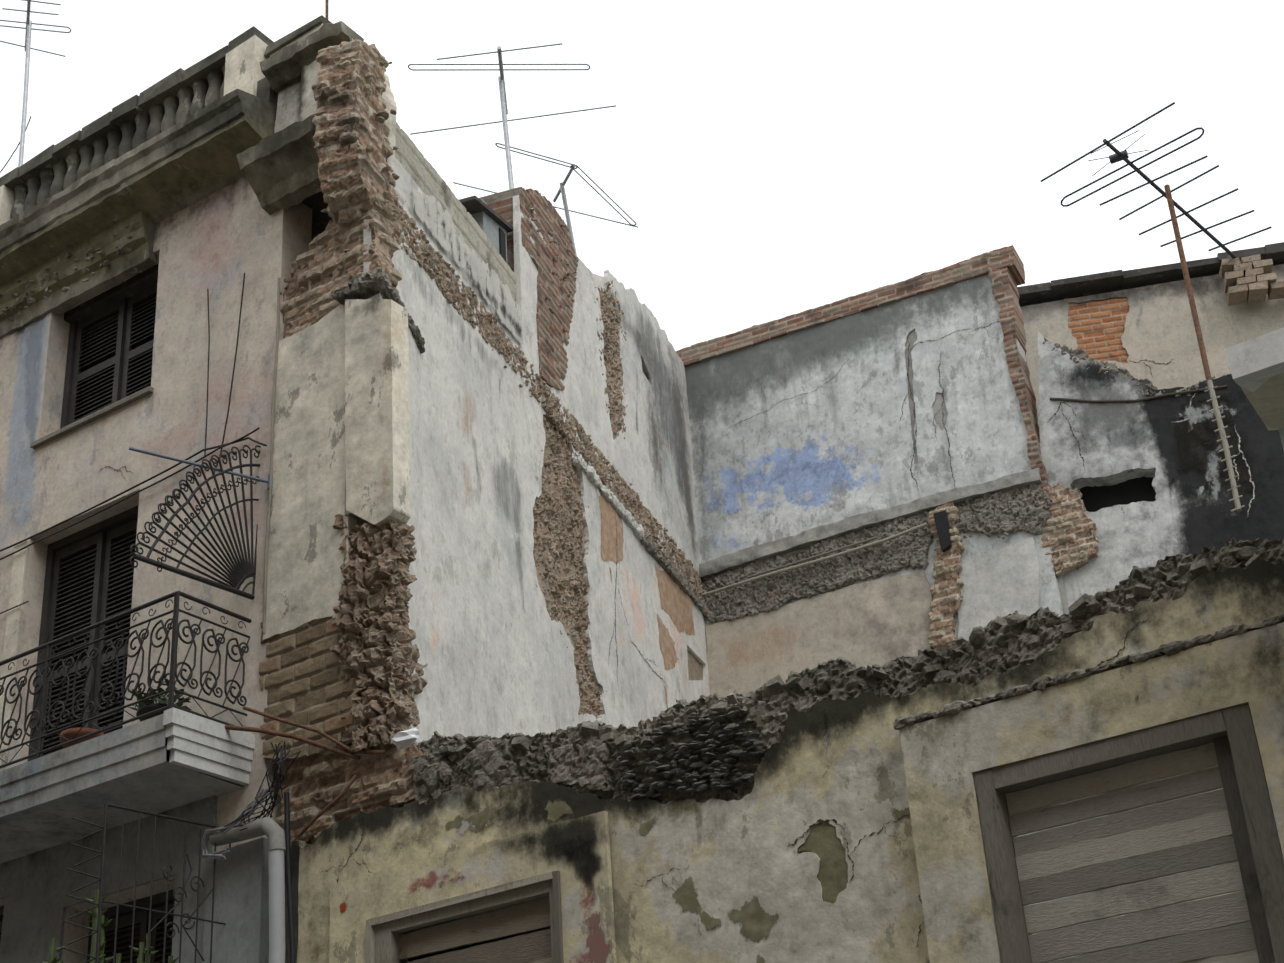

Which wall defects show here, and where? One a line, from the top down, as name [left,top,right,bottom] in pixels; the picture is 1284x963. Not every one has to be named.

spalling [280,39,440,338]
spalling [595,280,628,439]
crack [900,321,1000,491]
crack [1047,401,1087,471]
flaking render [1064,298,1129,364]
spalling [519,357,696,749]
spalling [933,510,952,553]
spalling [1040,482,1099,578]
flaking render [259,617,358,762]
leakage [563,839,600,889]
peeling [788,819,854,903]
peeling [672,877,779,963]